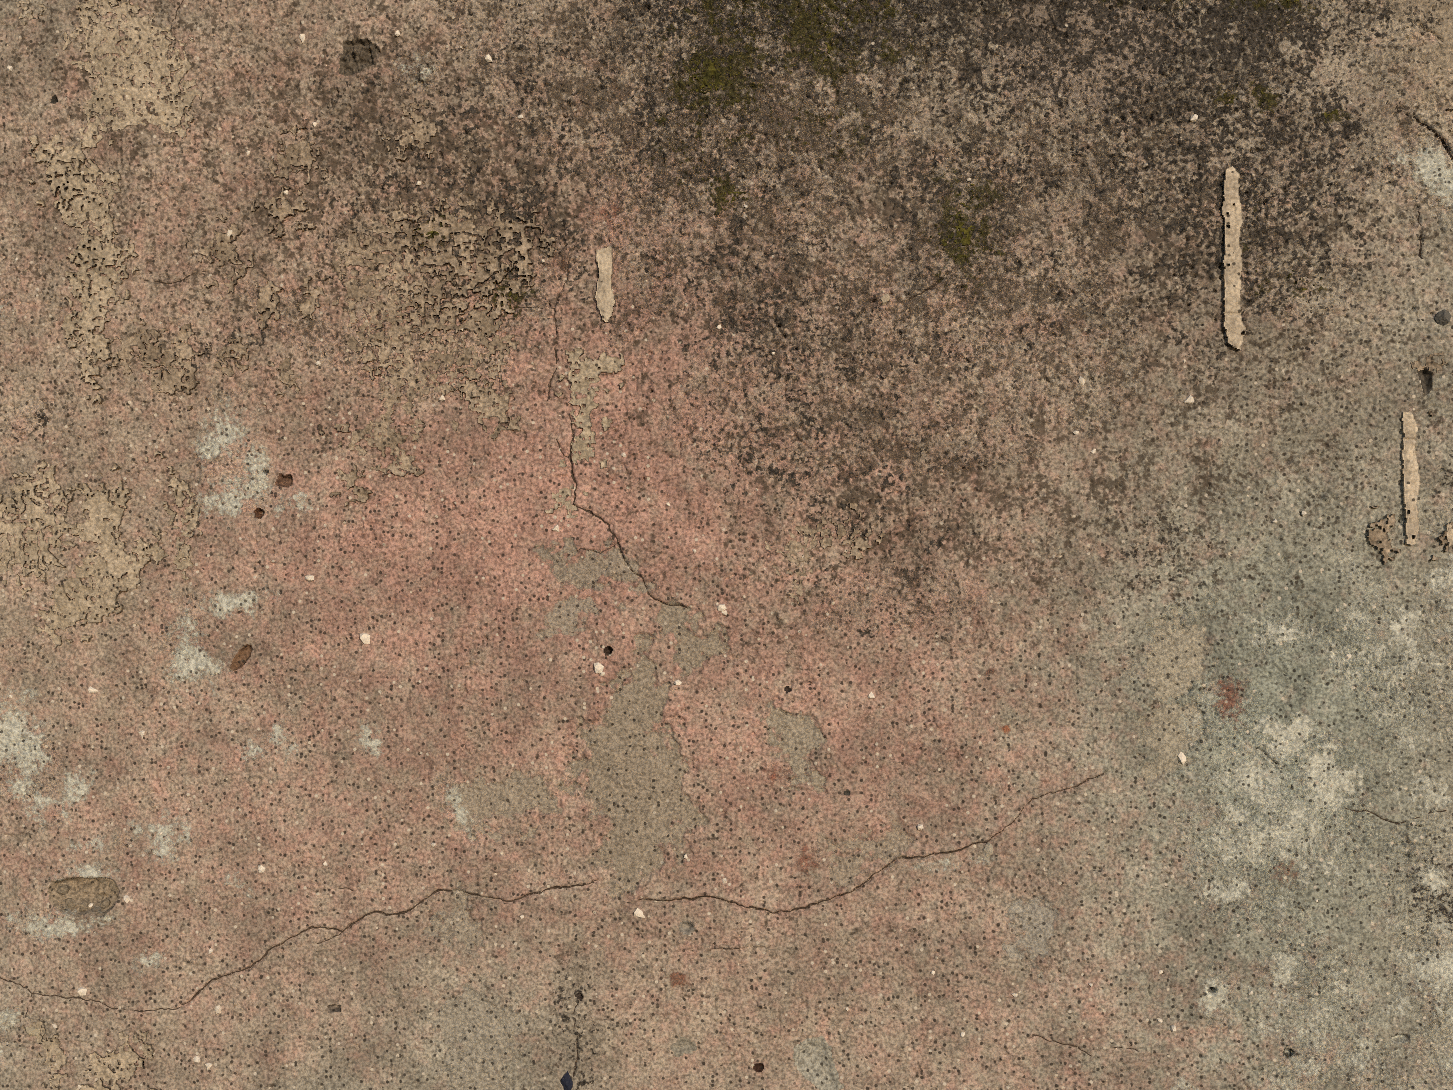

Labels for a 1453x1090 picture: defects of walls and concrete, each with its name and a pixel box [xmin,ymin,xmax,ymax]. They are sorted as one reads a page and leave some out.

spalling [339,38,380,76]
peeling [28,0,249,410]
peeling [251,122,329,238]
peeling [378,99,438,161]
leakage [166,296,288,373]
peeling [185,181,556,506]
leakage [244,0,1453,647]
crack [511,257,687,608]
peeling [0,451,203,648]
crack [639,773,1104,914]
crack [0,880,597,1018]